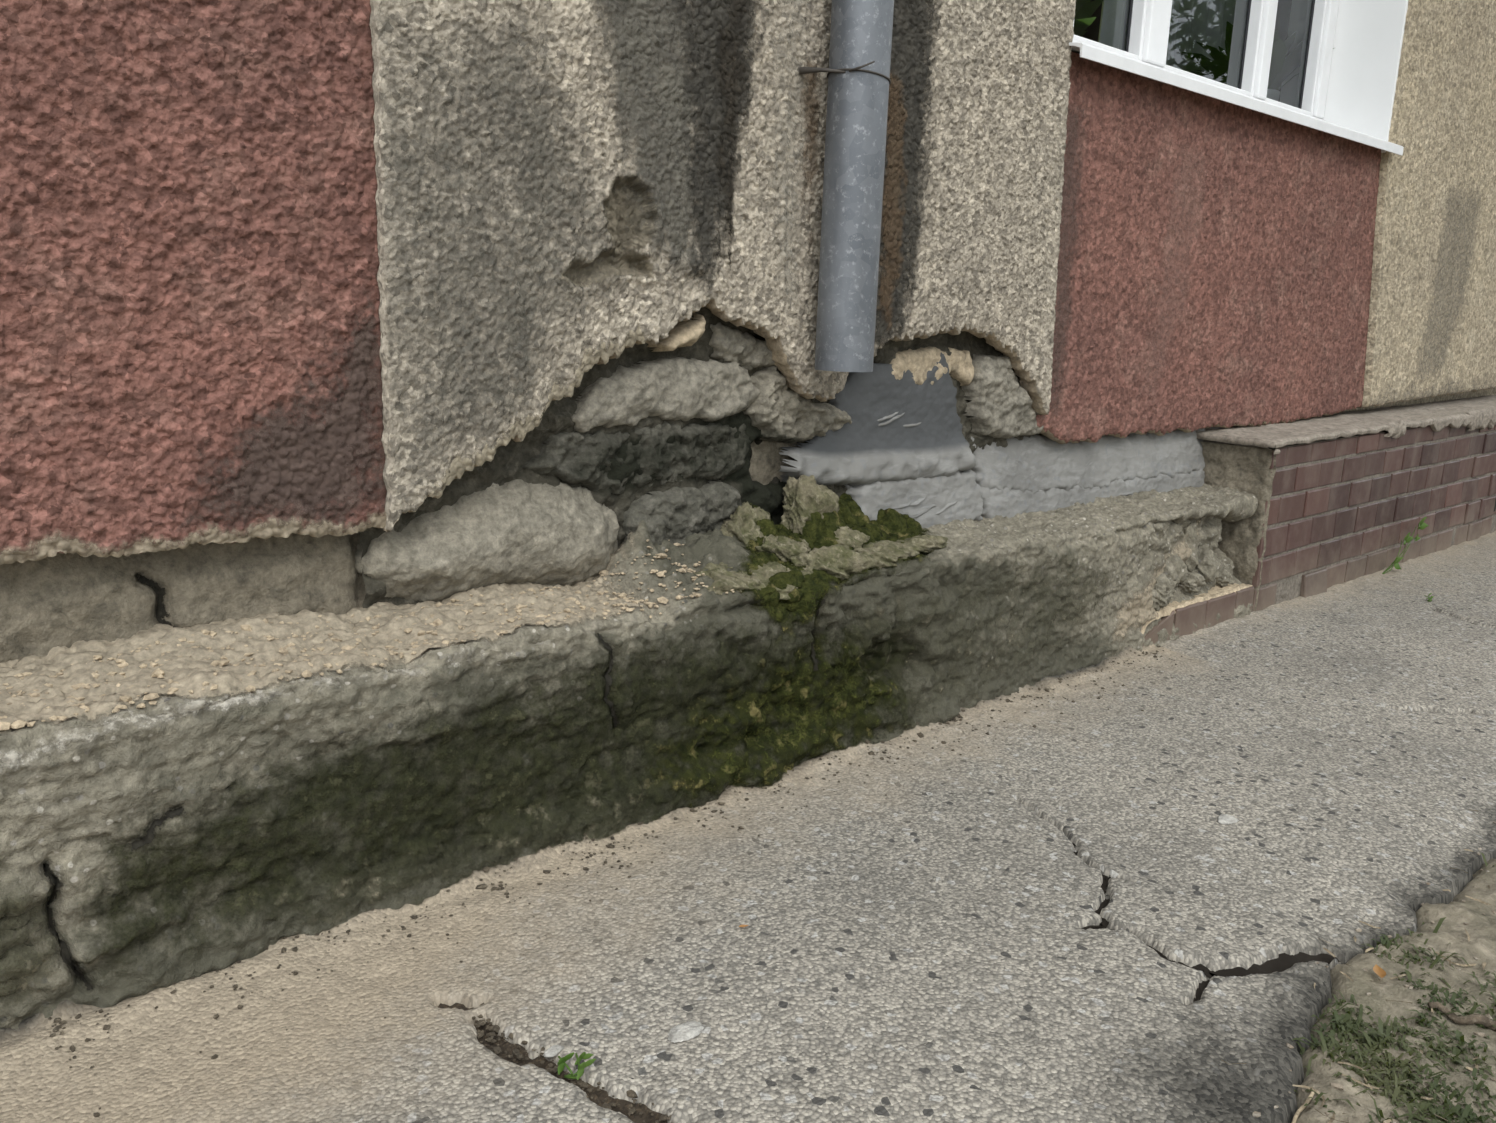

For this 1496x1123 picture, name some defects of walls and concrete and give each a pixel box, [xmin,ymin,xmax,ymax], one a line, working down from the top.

spalling [561,175,659,287]
water stain [597,0,761,287]
water stain [875,0,939,351]
spalling [0,307,948,608]
spalling [873,331,1044,471]
crack [136,573,174,627]
water stain [859,637,915,673]
crack [43,863,93,990]
crack [1072,843,1112,930]
crack [1147,945,1341,1002]
crack [438,1003,667,1123]